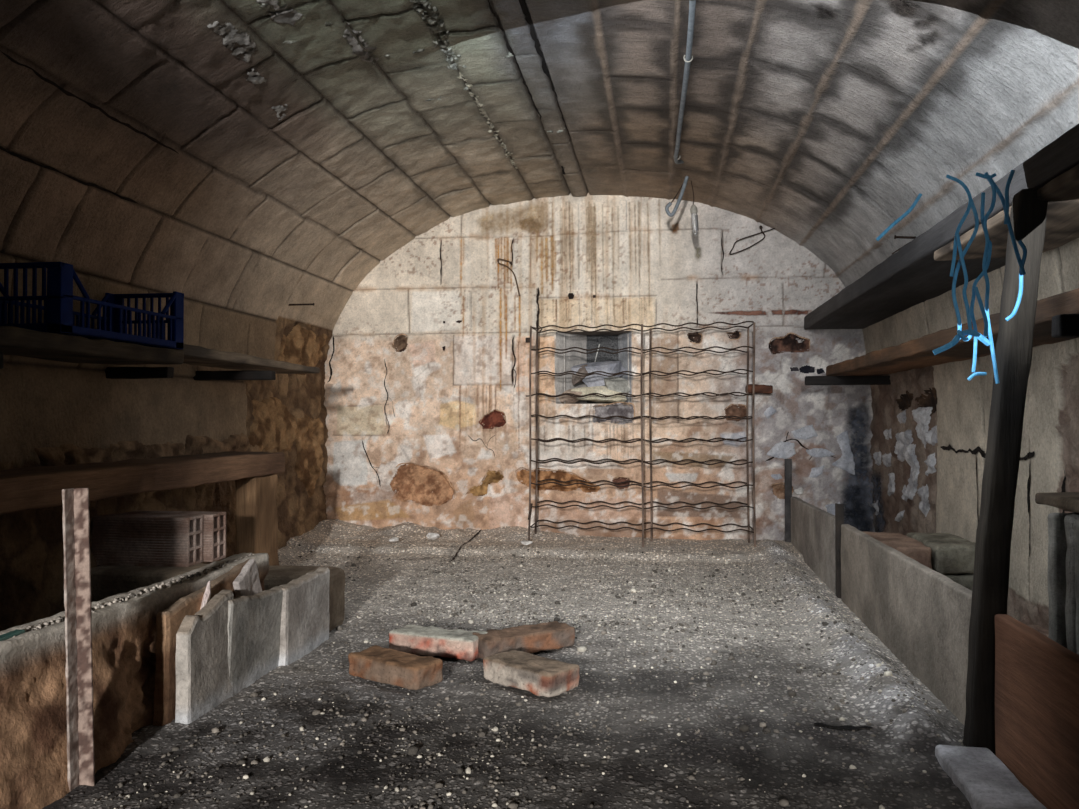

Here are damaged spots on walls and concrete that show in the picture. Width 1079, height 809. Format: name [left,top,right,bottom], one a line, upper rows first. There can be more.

damp [816,5,837,18]
damp [889,0,938,51]
corrosion [495,239,521,387]
spalling [479,410,506,429]
spalling [390,463,633,506]
damp [844,406,886,532]
peeling [872,387,938,522]
crack [941,445,986,516]
crack [1020,451,1034,556]
crack [1059,467,1067,513]
crack [400,529,482,562]